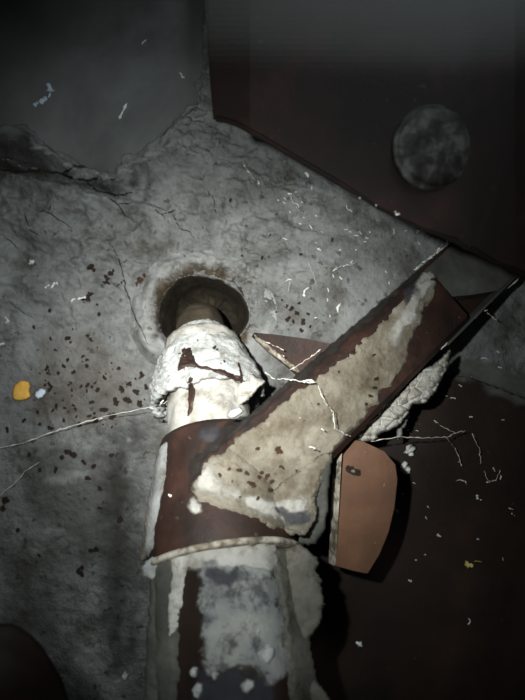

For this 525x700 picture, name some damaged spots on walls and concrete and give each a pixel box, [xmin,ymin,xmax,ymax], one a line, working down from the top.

spalling [0,0,208,183]
crack [25,205,72,235]
crack [0,165,134,222]
crack [106,238,148,344]
corrosion [281,299,317,332]
corrosion [31,358,148,428]
corrosion [54,450,96,480]
corrosion [218,467,274,492]